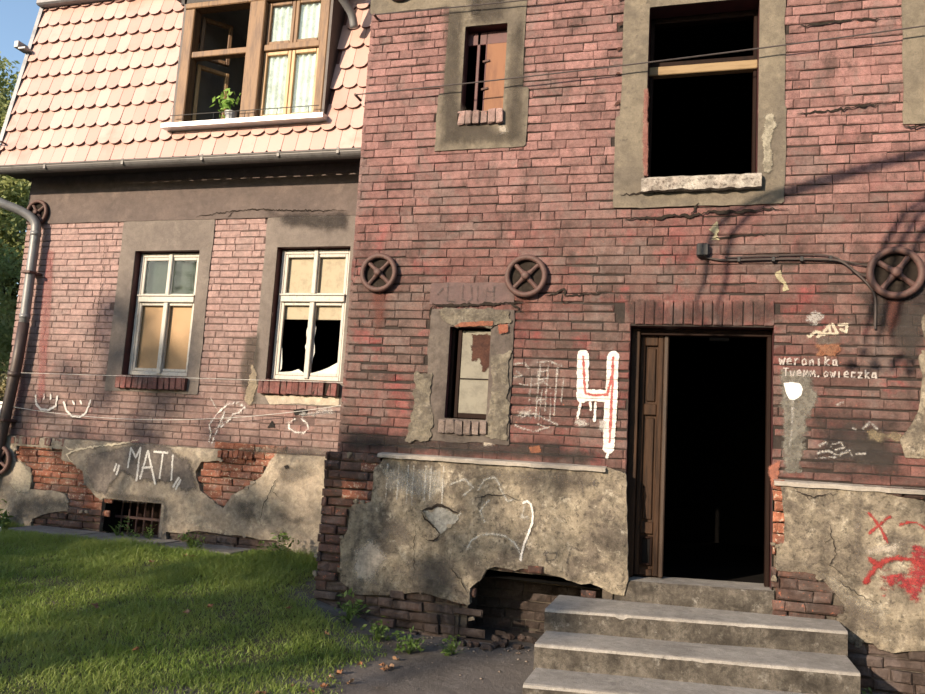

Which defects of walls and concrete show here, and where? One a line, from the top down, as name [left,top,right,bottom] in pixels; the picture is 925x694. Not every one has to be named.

crack [797,101,897,114]
crack [197,208,344,217]
crack [623,192,788,239]
flaking render [439,307,512,334]
flaking render [405,371,434,443]
spalling [13,446,114,533]
spalling [197,442,286,506]
peeling [768,369,818,554]
spalling [313,451,613,651]
spalling [771,566,846,624]
crack [825,524,878,604]
spalling [848,640,925,694]